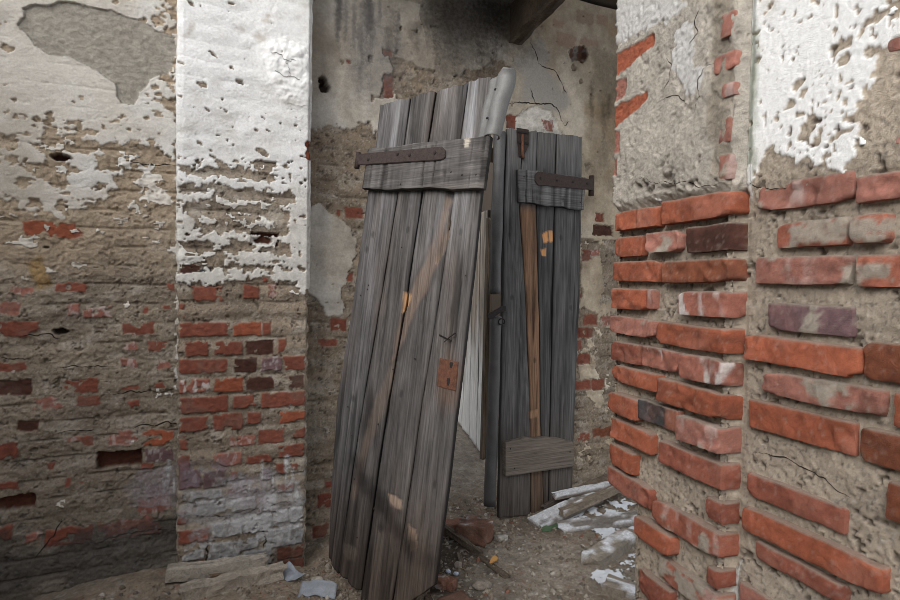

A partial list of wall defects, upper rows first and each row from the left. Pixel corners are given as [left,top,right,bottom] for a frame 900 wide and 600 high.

flaking render [17,0,177,105]
flaking render [153,99,176,122]
spalling [318,76,331,94]
flaking render [380,50,509,100]
crack [510,44,568,126]
crack [664,61,714,106]
flaking render [613,0,900,212]
flaking render [0,112,377,564]
crack [759,452,849,497]